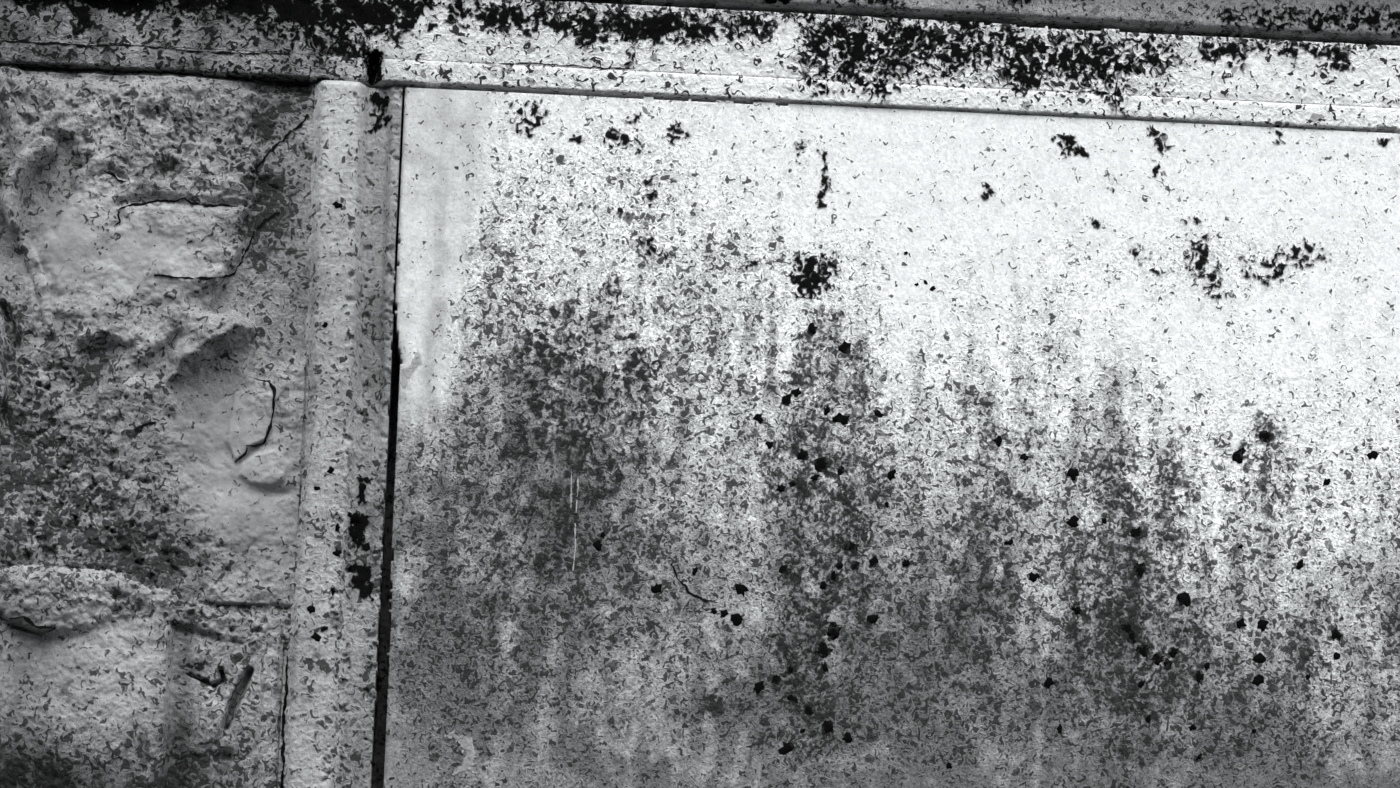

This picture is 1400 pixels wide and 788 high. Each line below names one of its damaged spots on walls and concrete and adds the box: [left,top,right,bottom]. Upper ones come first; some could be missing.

damp [11,0,1355,134]
damp [483,272,662,625]
damp [759,308,895,770]
damp [944,401,1040,668]
damp [1057,425,1214,768]
damp [1238,410,1304,565]
damp [1286,584,1344,776]